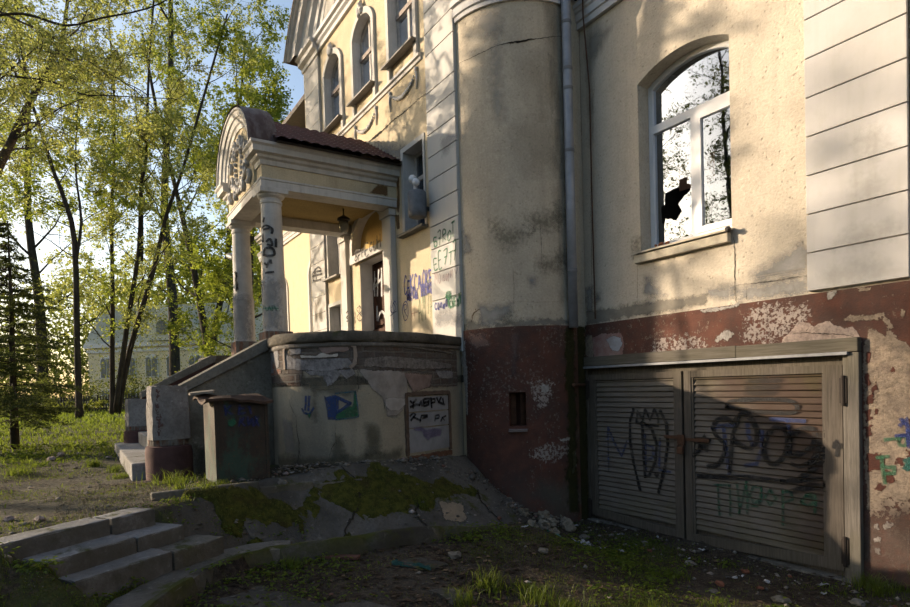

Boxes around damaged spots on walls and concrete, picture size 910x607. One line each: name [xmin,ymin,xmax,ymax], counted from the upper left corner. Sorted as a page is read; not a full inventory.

crack [460,36,561,63]
flaking render [270,332,489,417]
peeling [585,332,624,357]
leakage [577,246,808,520]
peeling [651,299,910,555]